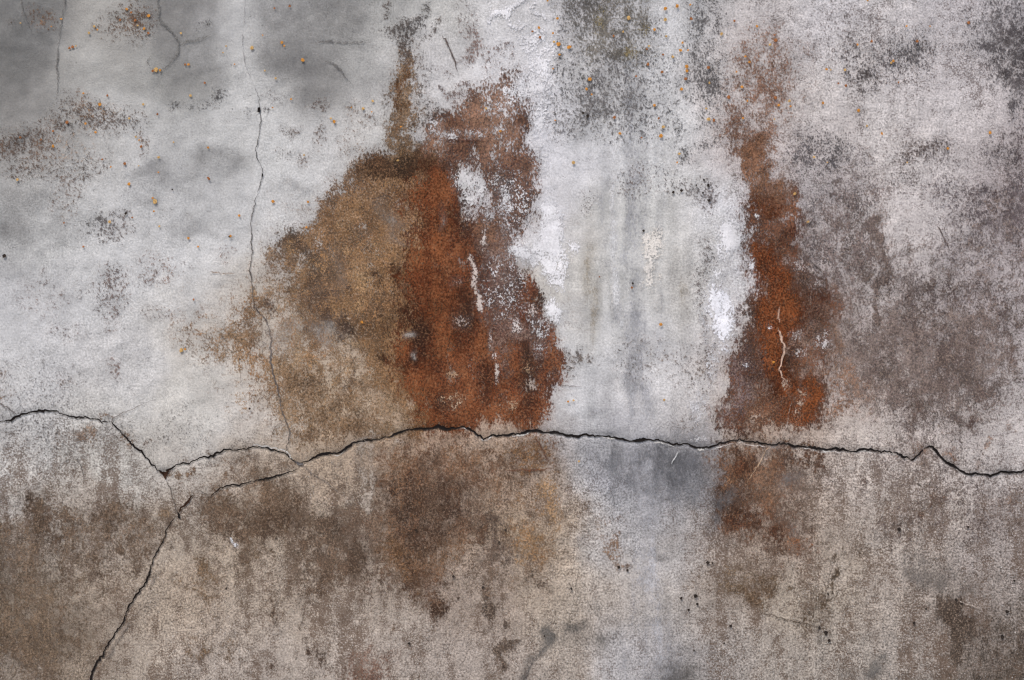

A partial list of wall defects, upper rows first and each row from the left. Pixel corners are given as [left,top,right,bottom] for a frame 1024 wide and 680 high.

rust [173,1,568,622]
crack [0,104,1024,519]
rust [704,24,882,583]
water stain [781,0,1024,550]
water stain [0,490,180,680]
crack [90,519,174,680]
water stain [167,428,376,666]
water stain [341,645,400,680]
water stain [478,585,520,672]
water stain [522,627,555,678]
water stain [597,513,630,571]